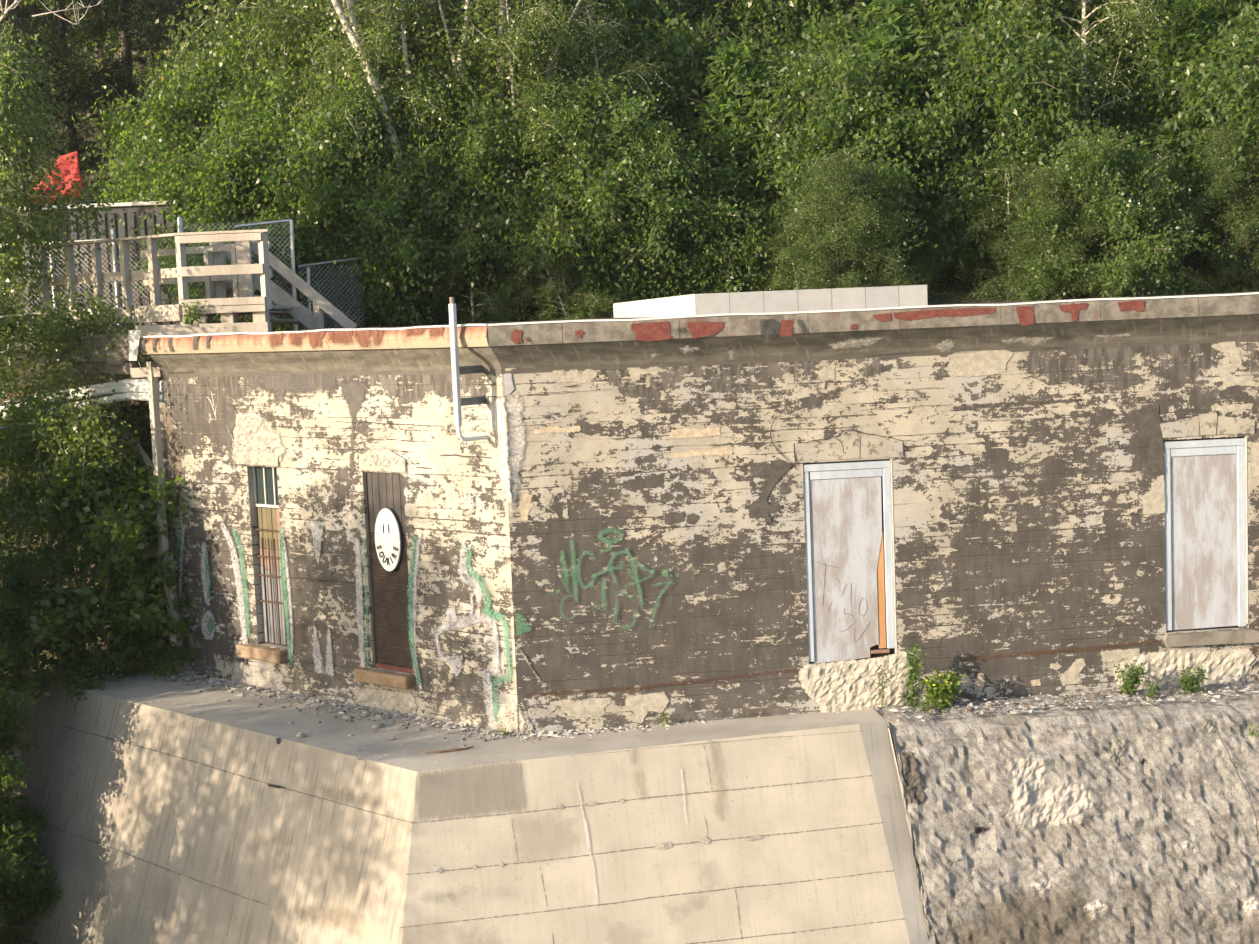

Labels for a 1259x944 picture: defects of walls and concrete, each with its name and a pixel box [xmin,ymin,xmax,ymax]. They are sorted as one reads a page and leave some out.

corrosion [269,329,383,349]
corrosion [405,326,443,338]
peeling [947,350,1013,377]
peeling [1211,341,1259,412]
spalling [232,412,285,467]
spalling [484,368,581,521]
peeling [1141,475,1166,515]
spalling [798,652,910,716]
peeling [1050,658,1086,686]
spalling [1100,648,1259,690]
peeling [549,691,670,723]
crack [1214,730,1259,844]